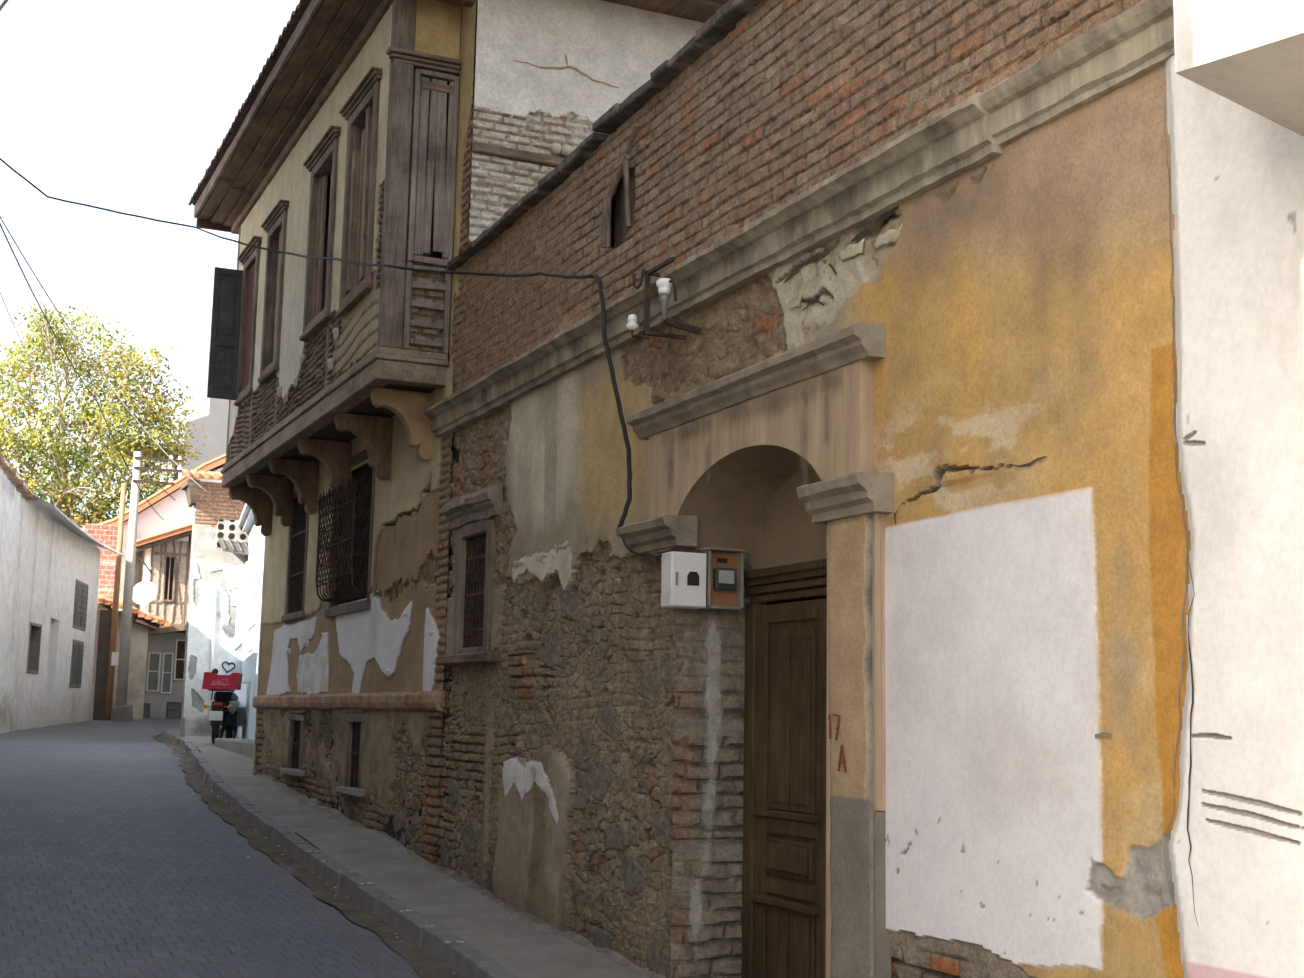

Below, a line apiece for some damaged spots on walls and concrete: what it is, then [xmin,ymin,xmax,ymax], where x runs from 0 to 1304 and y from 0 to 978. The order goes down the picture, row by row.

crack [513,54,620,88]
flaking render [621,205,902,405]
crack [894,456,1046,525]
peeling [193,556,238,627]
peeling [188,655,205,713]
spalling [254,404,676,978]
flaking render [1084,829,1175,920]
spalling [889,929,1036,978]